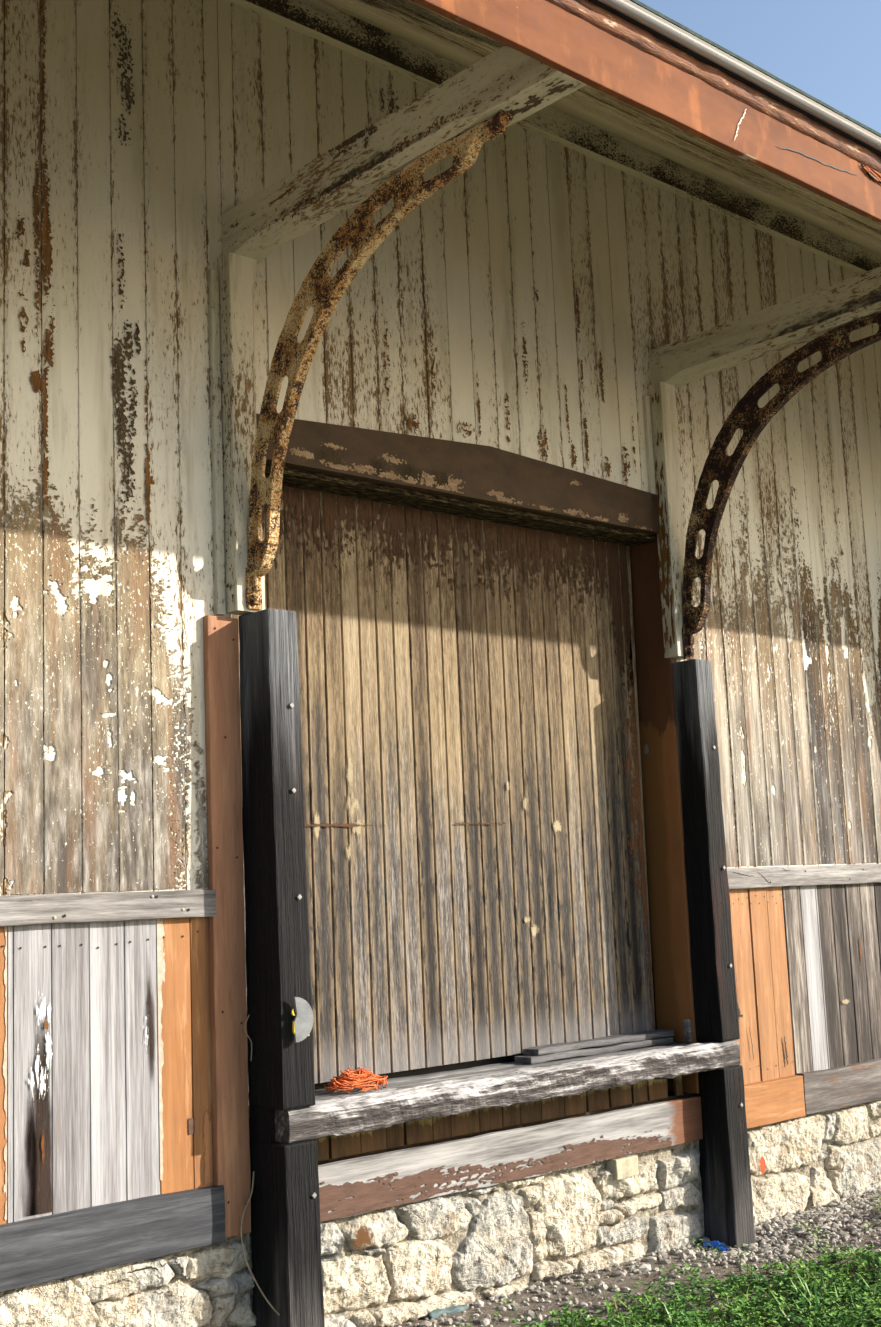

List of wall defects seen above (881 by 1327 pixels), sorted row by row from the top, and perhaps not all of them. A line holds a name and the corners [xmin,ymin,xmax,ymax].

leakage [246,0,455,84]
leakage [357,0,510,48]
peeling [229,60,574,247]
leakage [530,116,881,271]
peeling [0,0,209,894]
peeling [290,442,464,494]
peeling [383,322,427,434]
peeling [457,373,482,442]
peeling [564,379,636,486]
peeling [487,425,675,652]
peeling [684,460,881,867]
peeling [319,1127,672,1222]